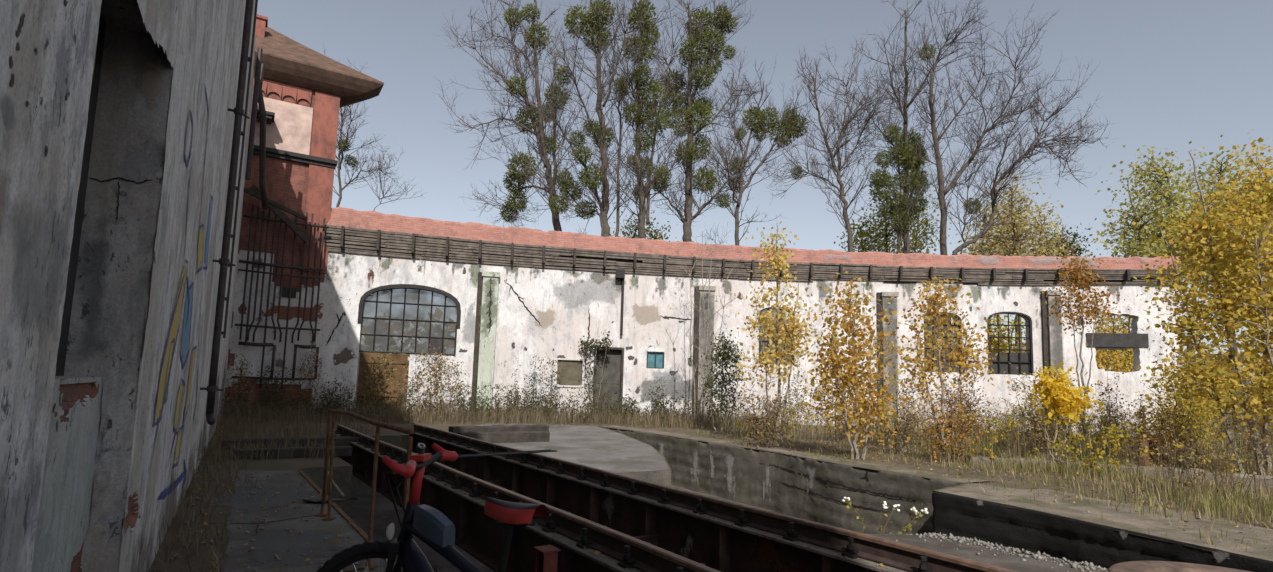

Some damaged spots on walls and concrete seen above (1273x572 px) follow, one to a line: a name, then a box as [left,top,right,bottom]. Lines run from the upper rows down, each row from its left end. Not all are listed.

peeling [10,14,25,87]
crack [88,64,174,381]
peeling [225,250,356,389]
crack [486,283,541,333]
spalling [52,376,99,432]